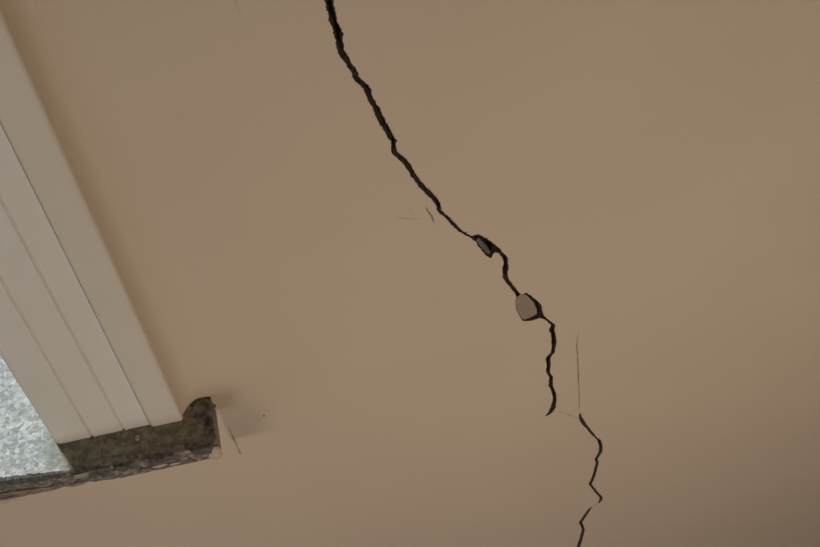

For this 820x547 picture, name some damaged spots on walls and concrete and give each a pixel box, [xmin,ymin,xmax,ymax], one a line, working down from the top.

crack [324,0,470,236]
crack [500,253,518,293]
crack [544,319,557,416]
crack [577,413,603,547]